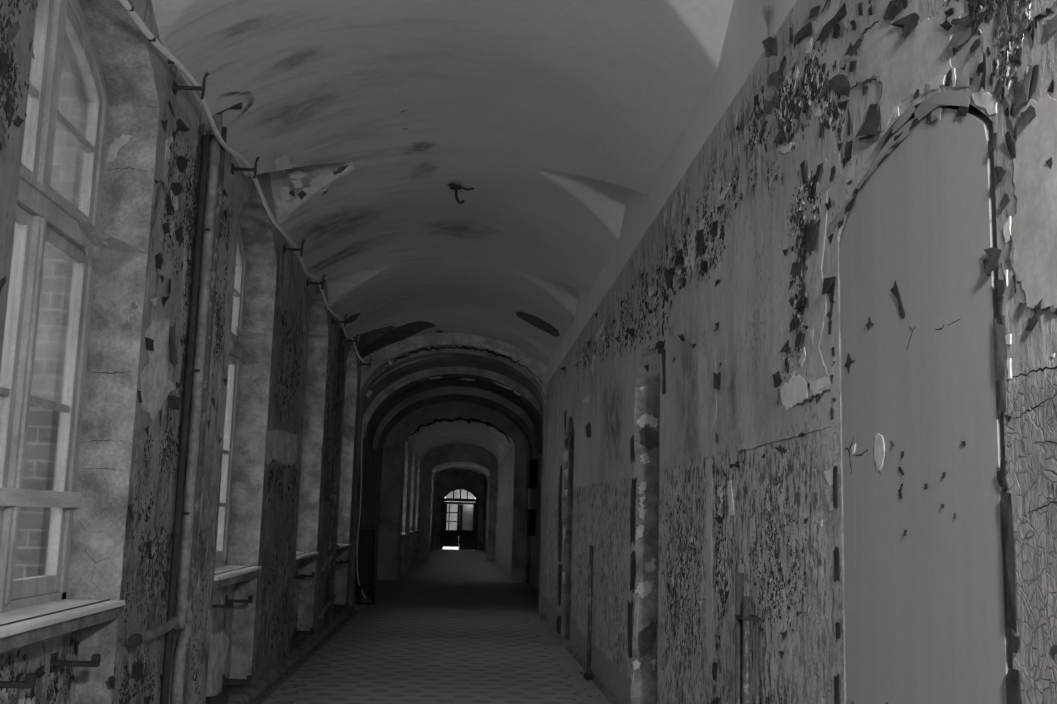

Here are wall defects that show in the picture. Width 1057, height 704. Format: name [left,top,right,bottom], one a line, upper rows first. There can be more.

peeling [0,0,38,151]
peeling [275,156,355,215]
peeling [89,100,210,485]
peeling [515,311,560,337]
flaking render [561,0,1057,685]
crack [1026,312,1038,331]
crack [1013,353,1057,419]
spalling [556,409,569,634]
peeling [80,493,173,629]
peeling [0,638,80,704]
peeling [108,651,162,704]
spalling [834,674,854,704]